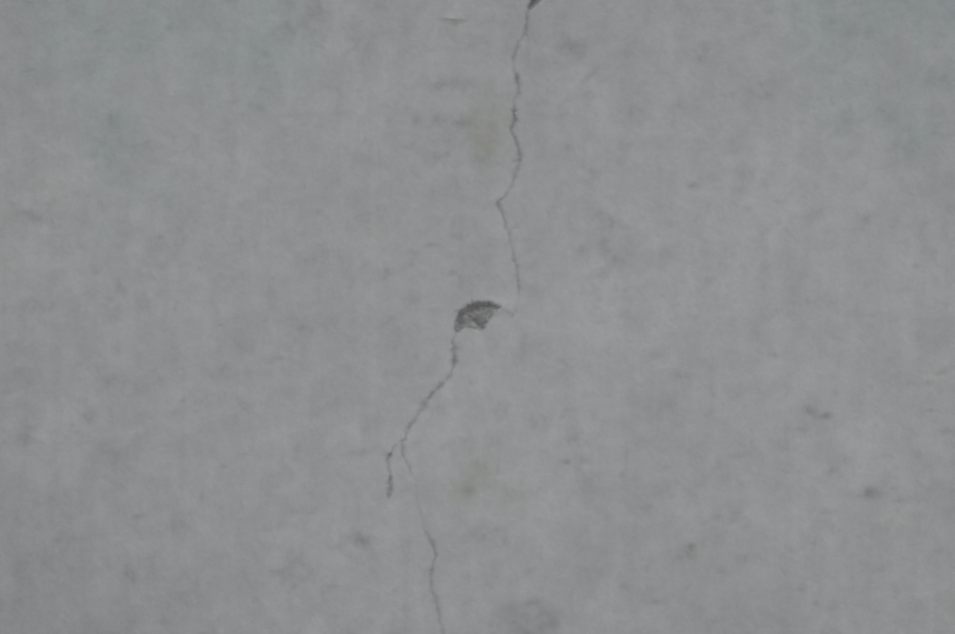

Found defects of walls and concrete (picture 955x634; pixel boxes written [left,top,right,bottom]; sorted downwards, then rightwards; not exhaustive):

flaking render [454,301,501,332]